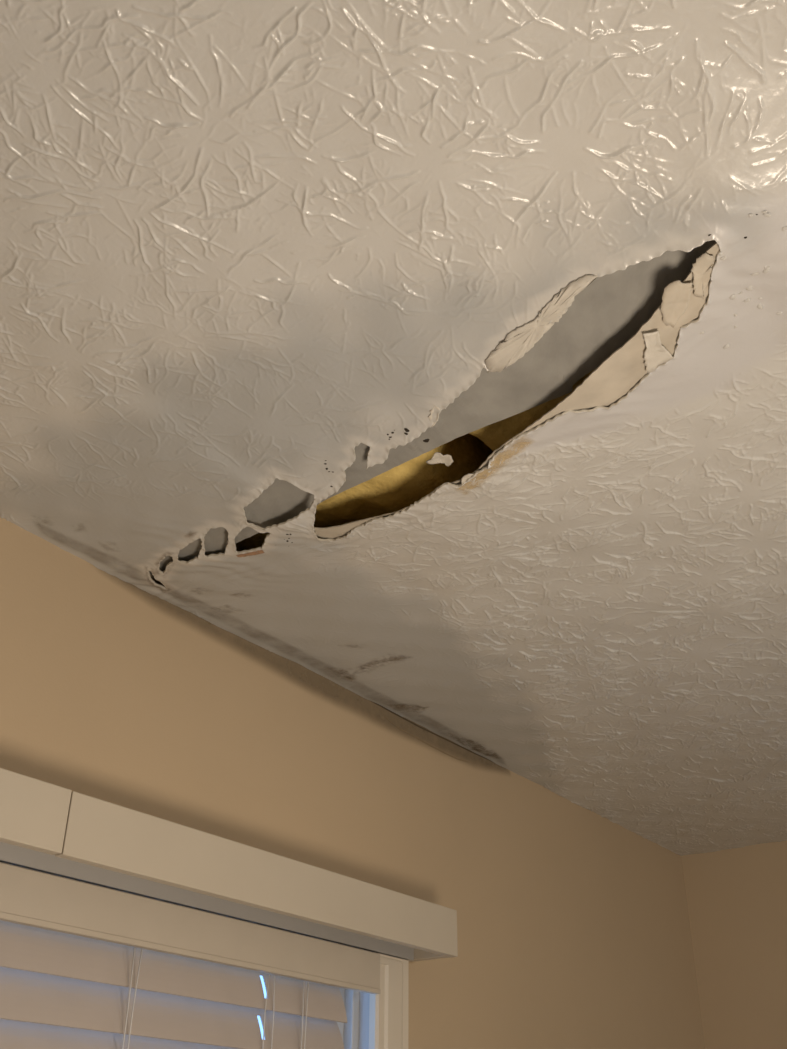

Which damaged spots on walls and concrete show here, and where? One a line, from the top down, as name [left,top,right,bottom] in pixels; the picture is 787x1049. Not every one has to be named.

leakage [126,582,505,769]